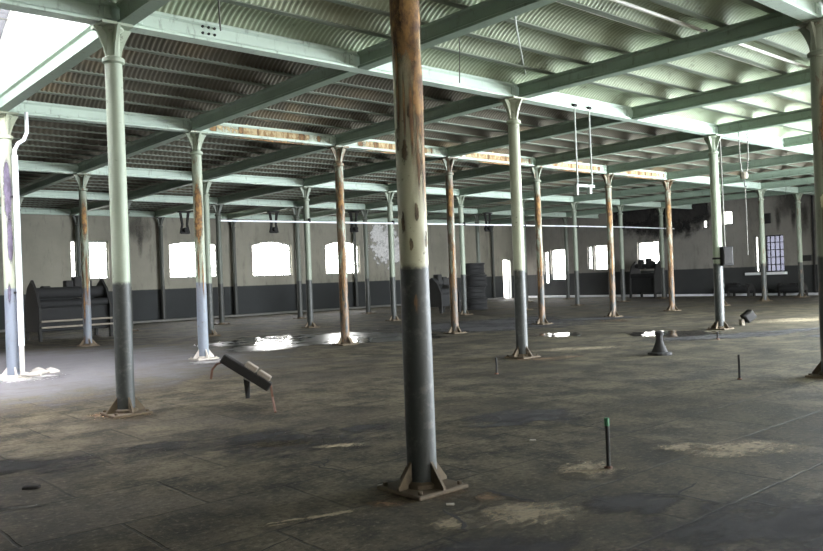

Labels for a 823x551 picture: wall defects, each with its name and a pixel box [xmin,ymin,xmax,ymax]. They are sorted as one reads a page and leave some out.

rust [210,124,321,145]
rust [358,141,396,154]
rust [389,0,432,211]
rust [194,183,204,293]